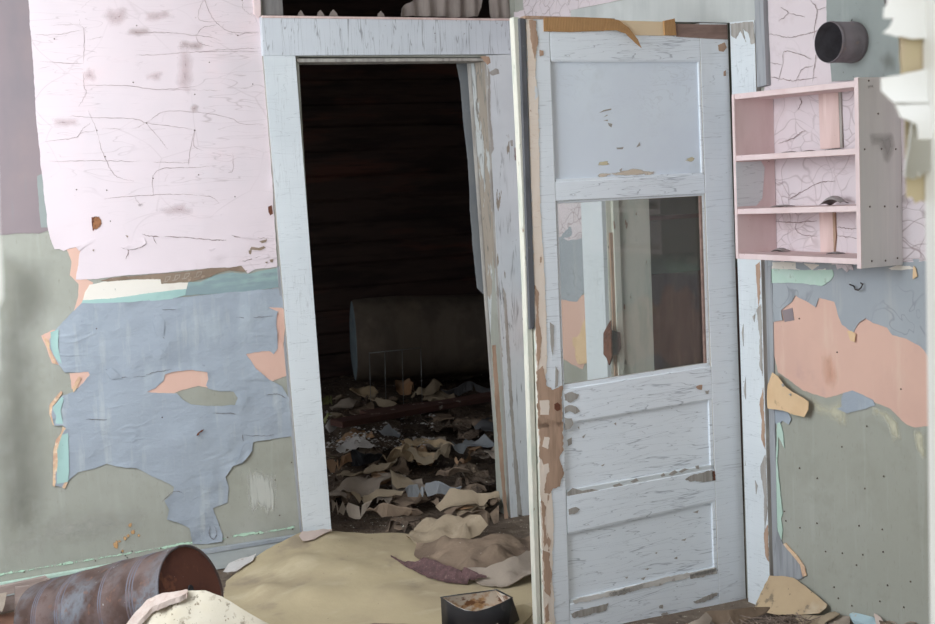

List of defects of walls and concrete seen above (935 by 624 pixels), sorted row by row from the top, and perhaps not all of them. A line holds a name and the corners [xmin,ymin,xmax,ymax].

crack [139,1,259,55]
crack [770,1,825,109]
crack [36,20,252,206]
peeling [0,0,292,544]
crack [123,234,237,257]
peeling [514,0,618,624]
crack [776,181,833,237]
peeling [752,0,928,580]
peeling [661,465,716,482]
peeling [571,567,717,618]